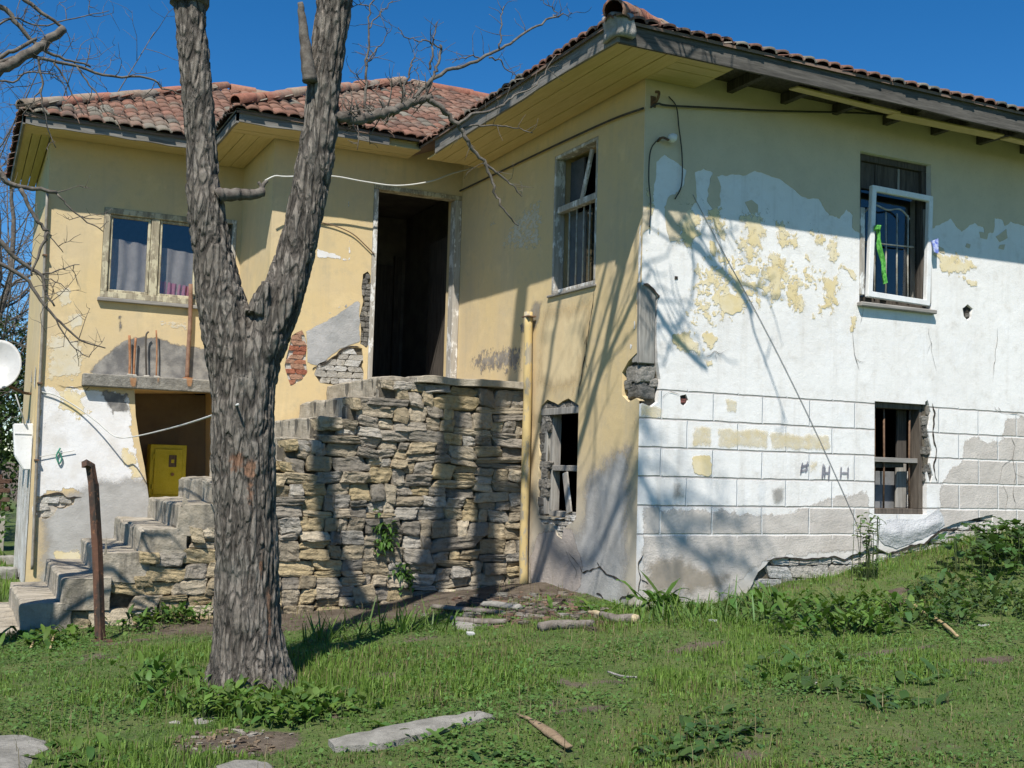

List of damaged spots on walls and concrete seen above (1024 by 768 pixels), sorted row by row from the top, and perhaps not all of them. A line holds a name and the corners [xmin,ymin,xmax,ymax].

peeling [13,288,149,582]
flaking render [285,272,371,386]
leakage [472,347,522,375]
flaking render [529,399,629,605]
crack [565,550,648,600]
peeling [624,79,1024,417]
peeling [641,401,1024,604]